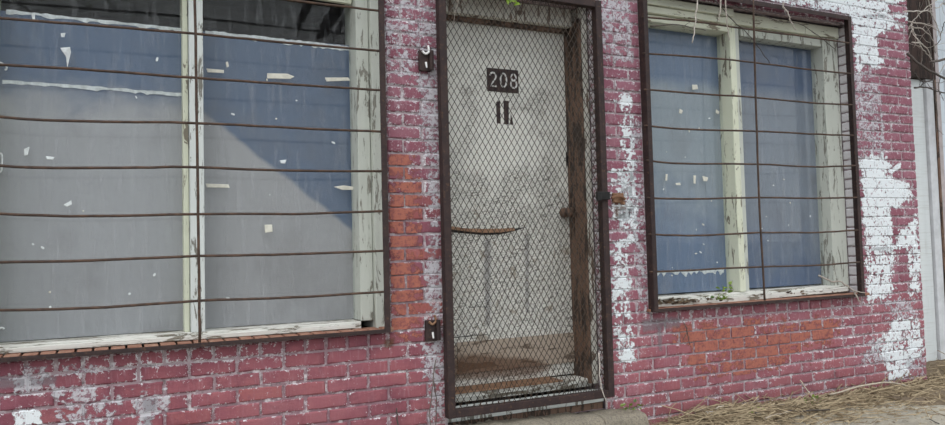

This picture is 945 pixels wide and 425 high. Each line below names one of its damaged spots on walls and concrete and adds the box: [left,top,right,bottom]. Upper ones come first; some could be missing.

peeling [600,0,634,63]
peeling [386,0,444,422]
peeling [608,93,651,363]
peeling [672,315,841,381]
peeling [771,0,925,382]